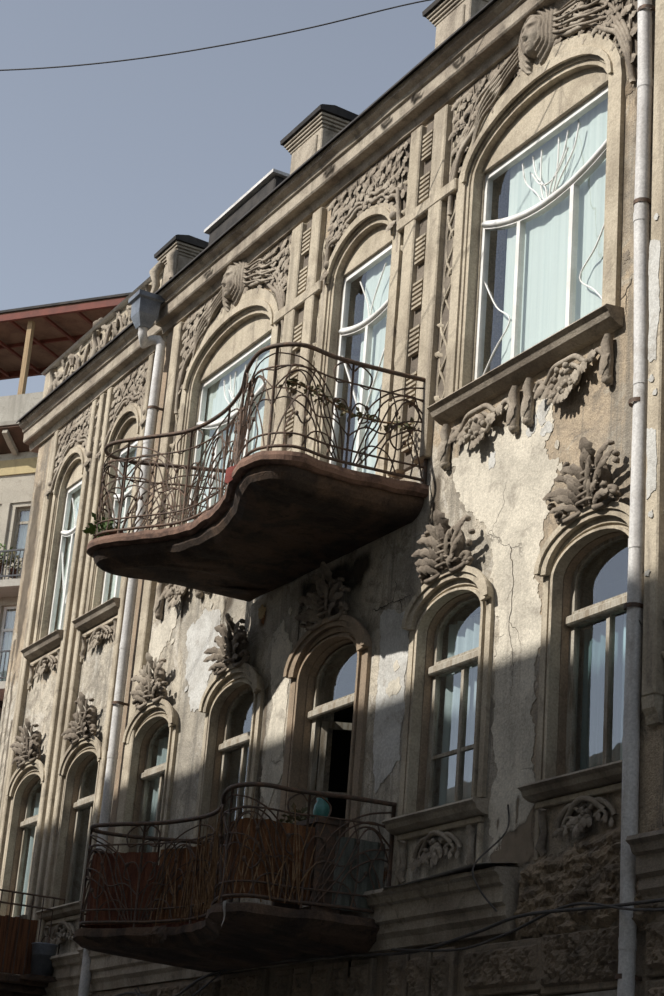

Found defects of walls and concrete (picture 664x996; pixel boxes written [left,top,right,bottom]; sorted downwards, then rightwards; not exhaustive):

peeling [148,602,222,712]
peeling [450,399,563,859]
crack [507,546,520,707]